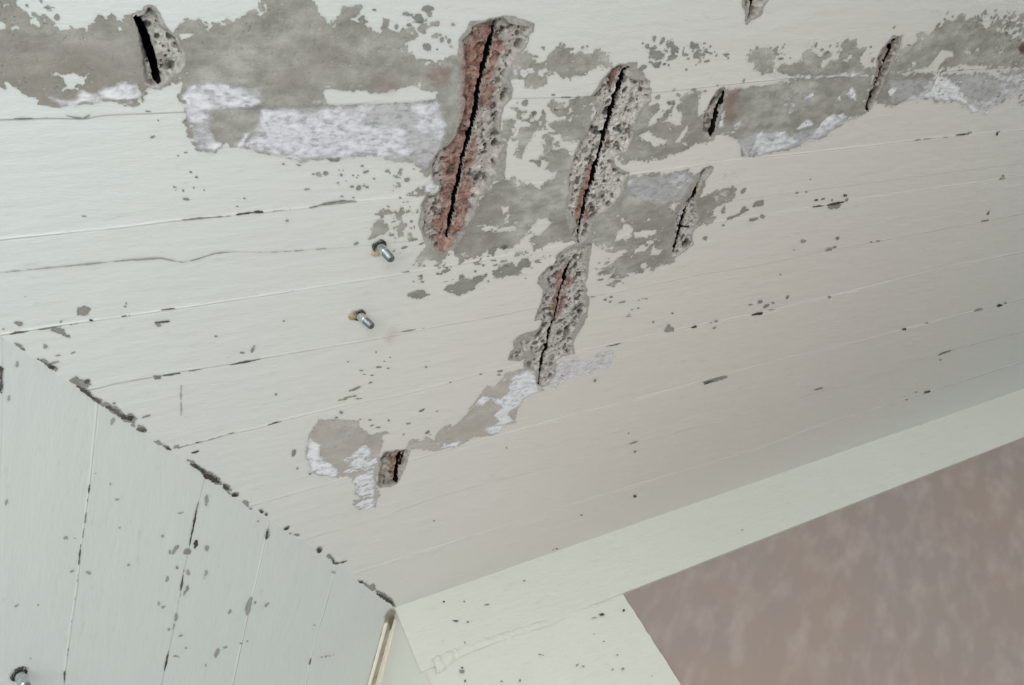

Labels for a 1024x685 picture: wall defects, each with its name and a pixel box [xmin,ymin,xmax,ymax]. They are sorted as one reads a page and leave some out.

rust [433,25,503,252]
peeling [0,0,1024,510]
spalling [165,545,190,596]